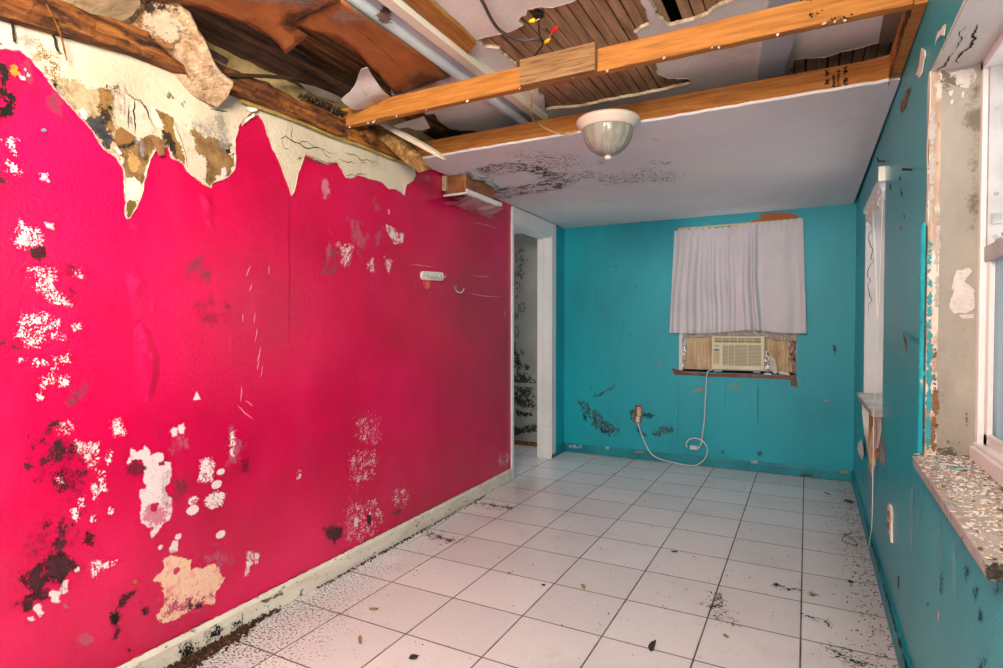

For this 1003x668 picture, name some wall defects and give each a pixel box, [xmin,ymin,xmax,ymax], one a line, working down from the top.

mould [0,62,20,118]
flaking render [0,21,416,219]
crack [282,130,378,176]
damp [476,151,679,199]
flaking render [476,0,734,68]
crack [935,25,978,72]
peeling [14,220,54,250]
peeling [16,266,87,401]
mould [514,241,537,437]
mould [24,410,89,494]
mould [16,509,96,613]
peeling [125,424,260,626]